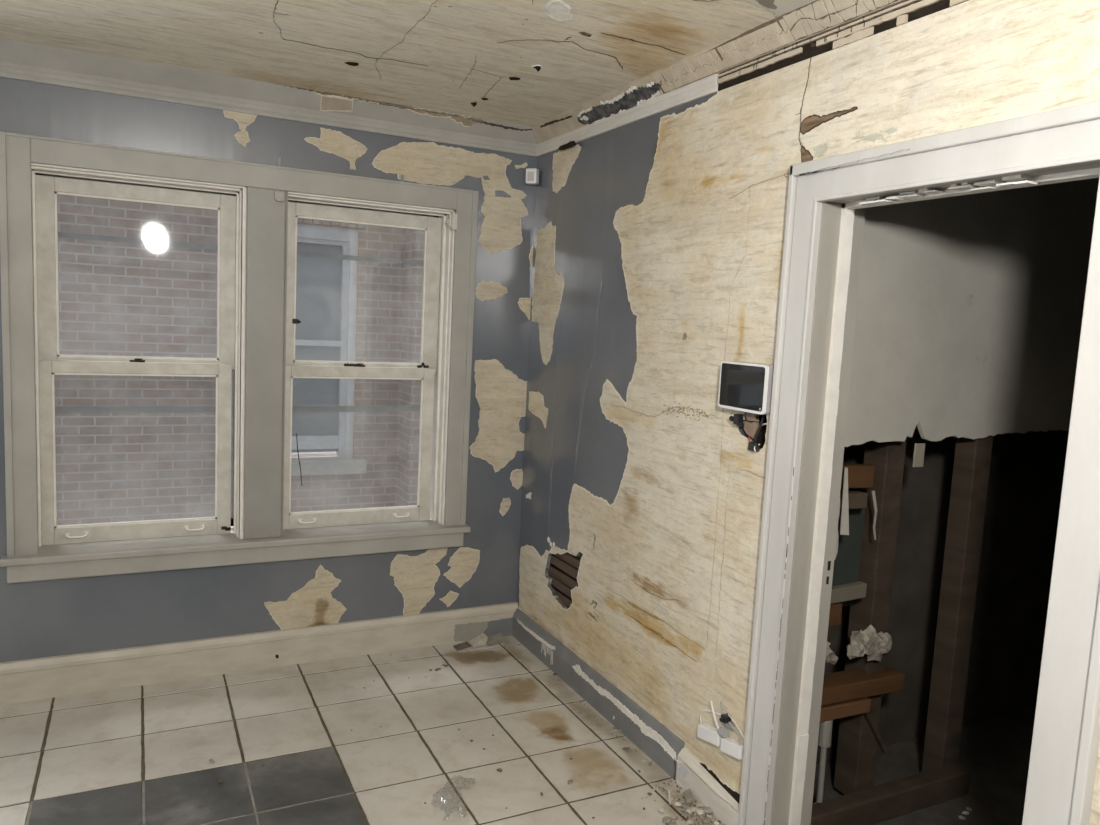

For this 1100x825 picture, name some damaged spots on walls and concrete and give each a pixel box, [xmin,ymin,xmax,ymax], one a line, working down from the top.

peeling [223,110,257,148]
crack [262,0,572,131]
peeling [304,127,564,365]
crack [548,0,967,361]
peeling [469,359,548,517]
peeling [517,0,1100,794]
peeling [264,564,347,630]
peeling [390,547,480,615]
peeling [1089,742,1100,825]